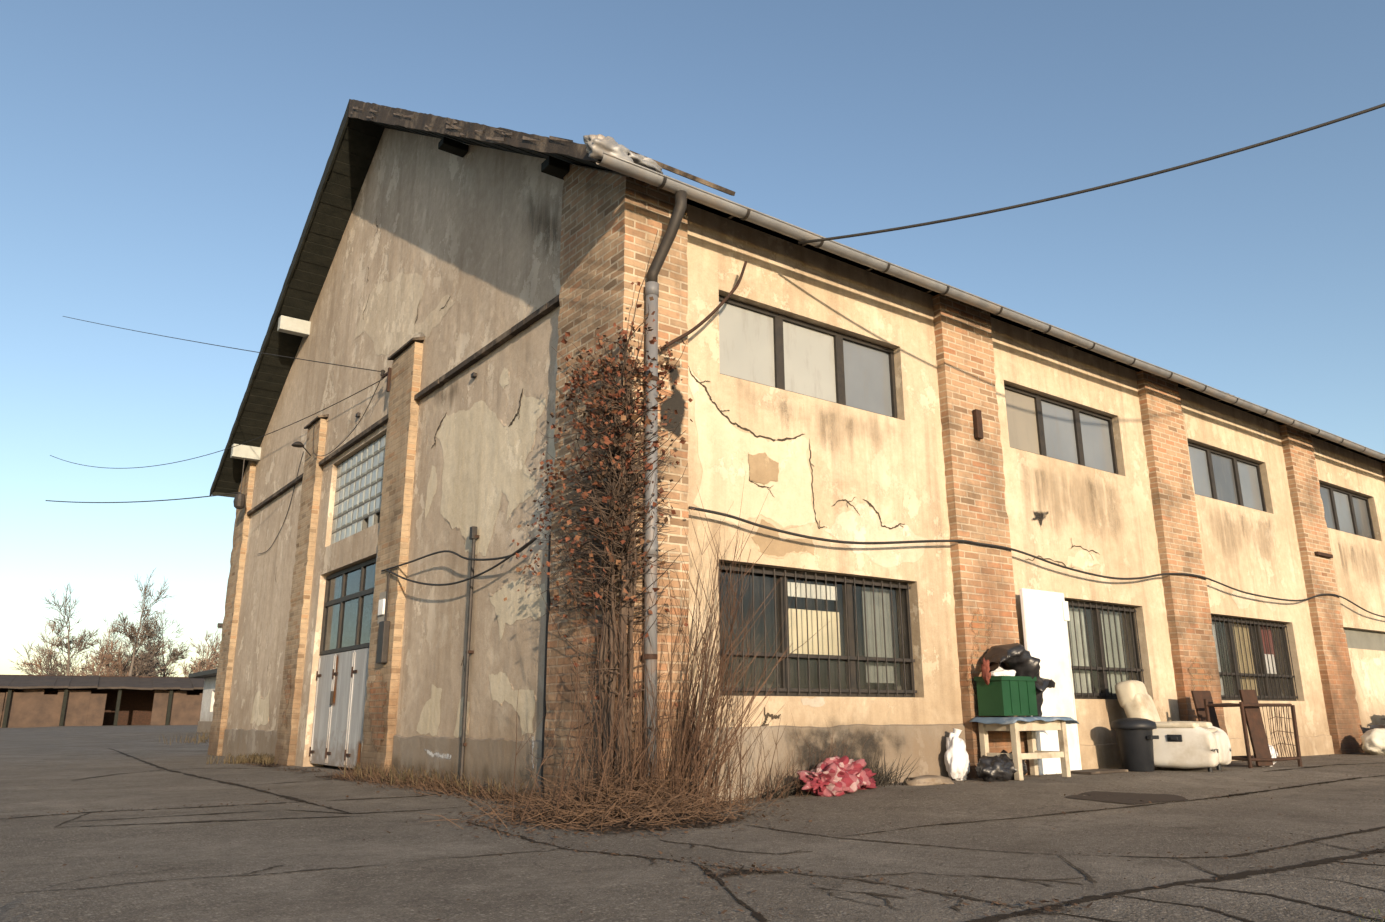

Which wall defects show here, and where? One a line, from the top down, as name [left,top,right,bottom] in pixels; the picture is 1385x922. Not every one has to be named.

peeling [425,394,556,557]
crack [508,389,523,427]
crack [688,366,905,530]
peeling [688,367,928,568]
peeling [489,576,547,640]
peeling [489,672,536,735]
crack [761,707,781,726]
crack [0,749,1385,922]